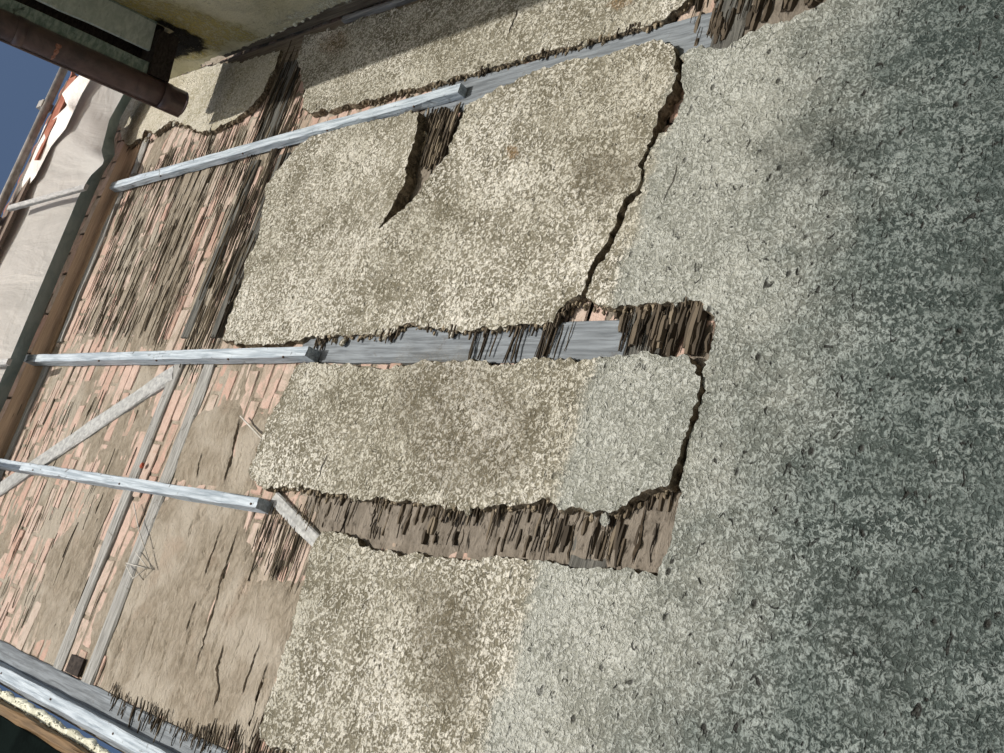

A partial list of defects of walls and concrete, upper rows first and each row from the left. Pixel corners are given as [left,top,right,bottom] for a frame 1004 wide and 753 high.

spalling [53,22,664,354]
spalling [313,296,716,368]
spalling [683,0,827,46]
spalling [0,363,682,753]